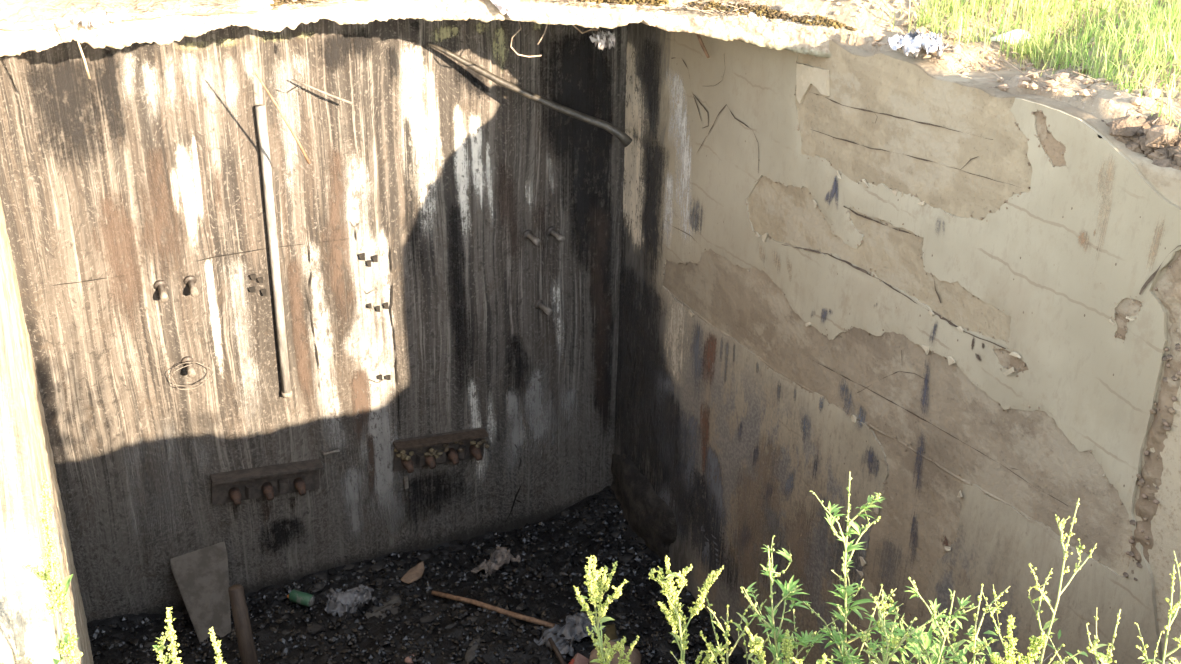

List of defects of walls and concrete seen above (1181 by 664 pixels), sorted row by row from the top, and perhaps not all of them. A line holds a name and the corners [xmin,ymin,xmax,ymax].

water stain [26,35,306,190]
water stain [170,139,202,238]
water stain [434,25,459,42]
crack [671,57,759,173]
peeling [794,40,1068,222]
water stain [205,260,259,420]
water stain [301,29,493,539]
water stain [506,335,578,466]
water stain [533,32,860,592]
corrosion [702,334,717,382]
peeling [746,176,1029,377]
peeling [662,249,1181,638]